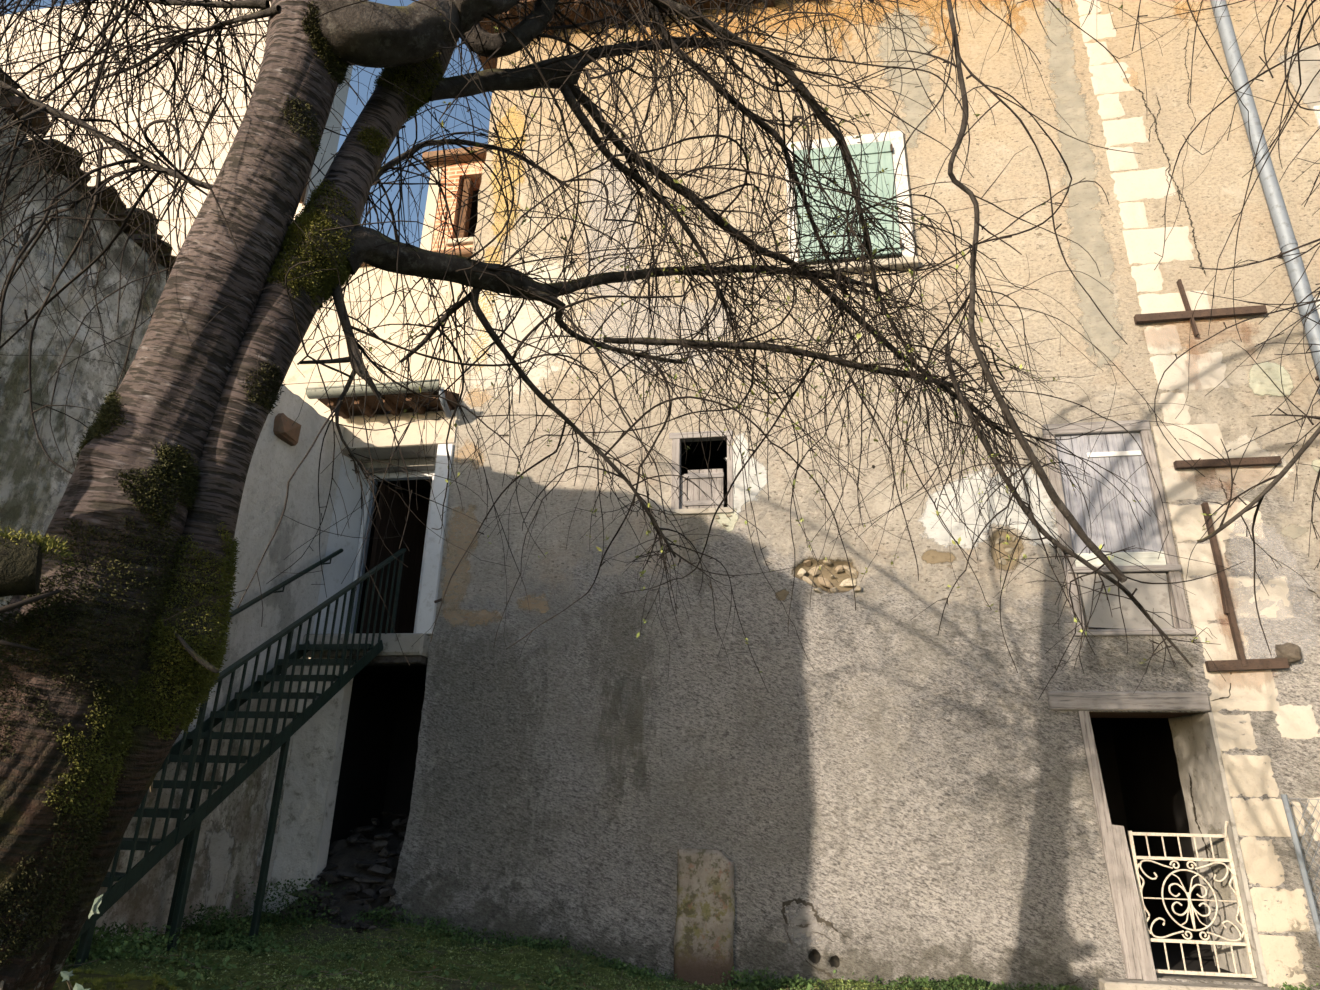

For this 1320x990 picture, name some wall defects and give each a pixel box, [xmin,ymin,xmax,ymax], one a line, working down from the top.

spalling [775,556,861,601]